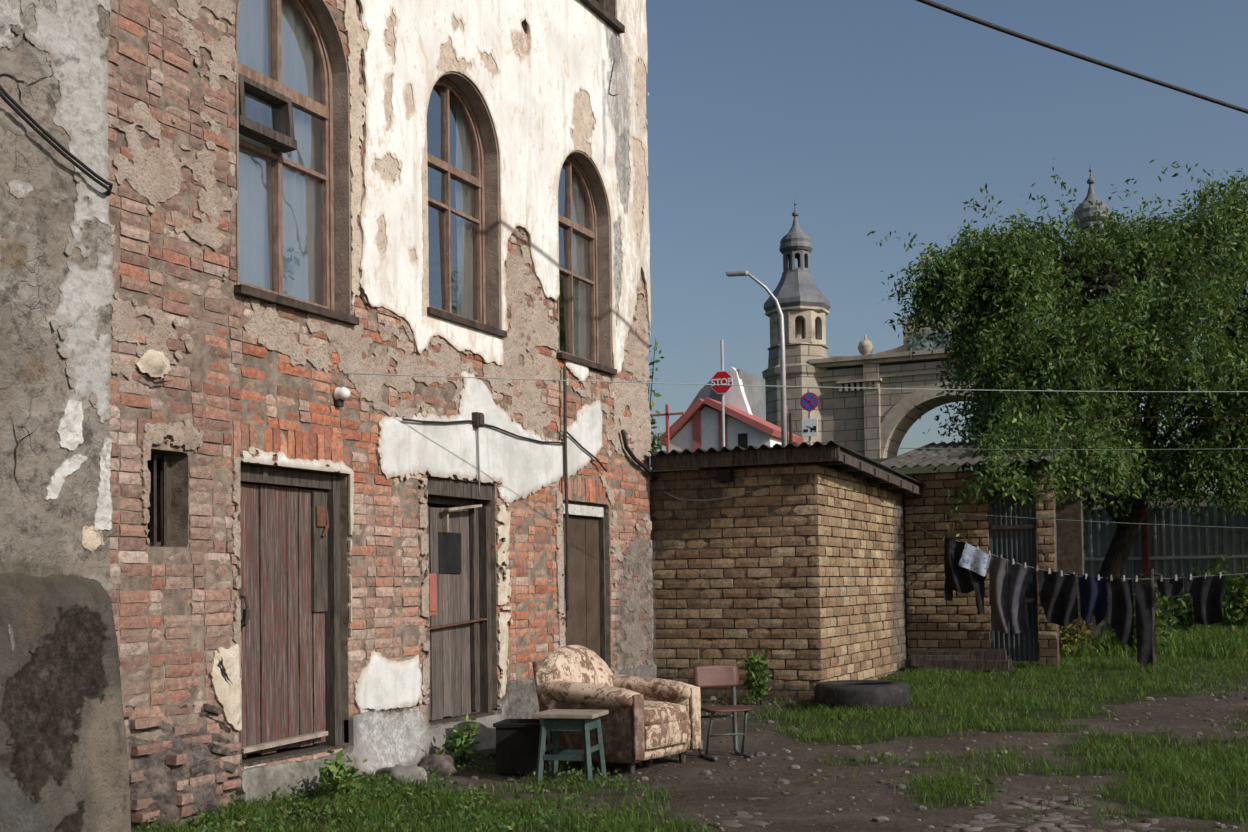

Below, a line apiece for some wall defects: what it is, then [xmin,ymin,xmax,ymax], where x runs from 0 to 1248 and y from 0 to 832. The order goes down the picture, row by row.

peeling [0,0,238,553]
flaking render [209,446,354,731]
flaking render [242,0,661,774]